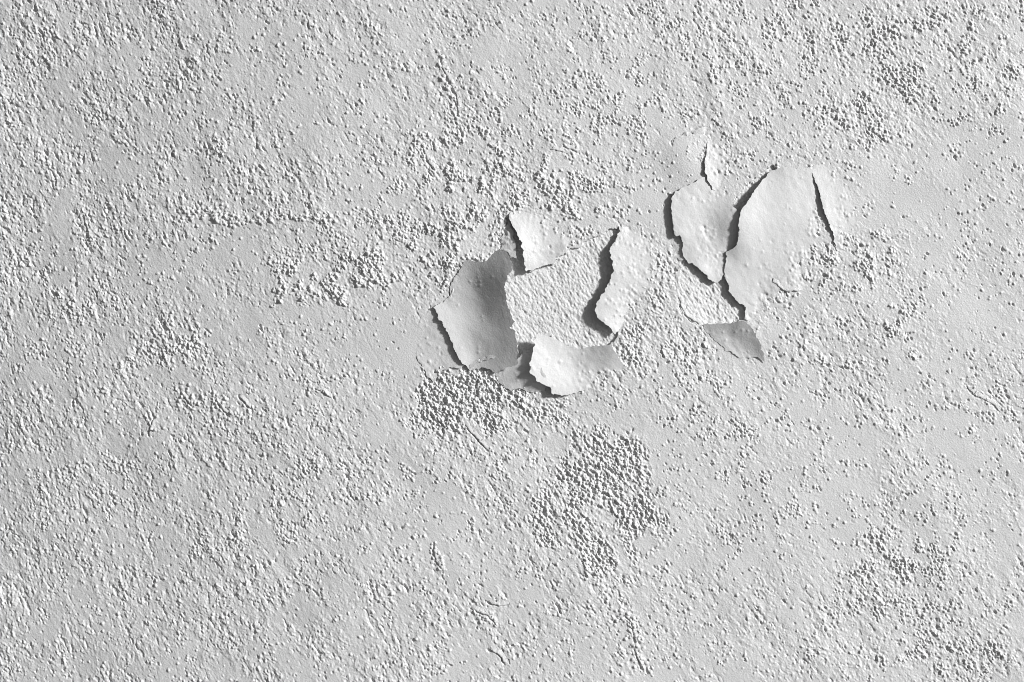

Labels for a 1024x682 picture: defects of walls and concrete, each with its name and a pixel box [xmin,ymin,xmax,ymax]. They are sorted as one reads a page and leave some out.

peeling [416,211,663,396]
peeling [671,141,859,361]